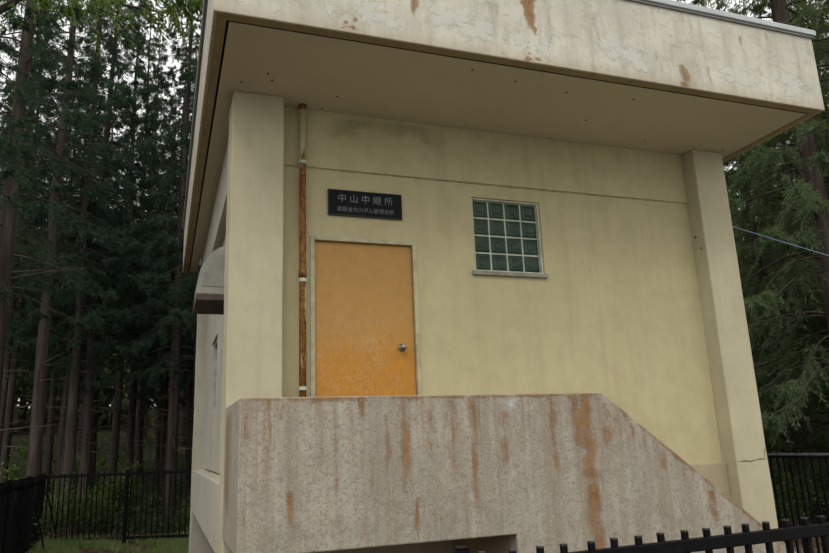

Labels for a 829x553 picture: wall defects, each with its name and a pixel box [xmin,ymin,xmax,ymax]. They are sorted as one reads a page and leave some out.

rust [521,0,537,32]
rust [519,393,607,549]